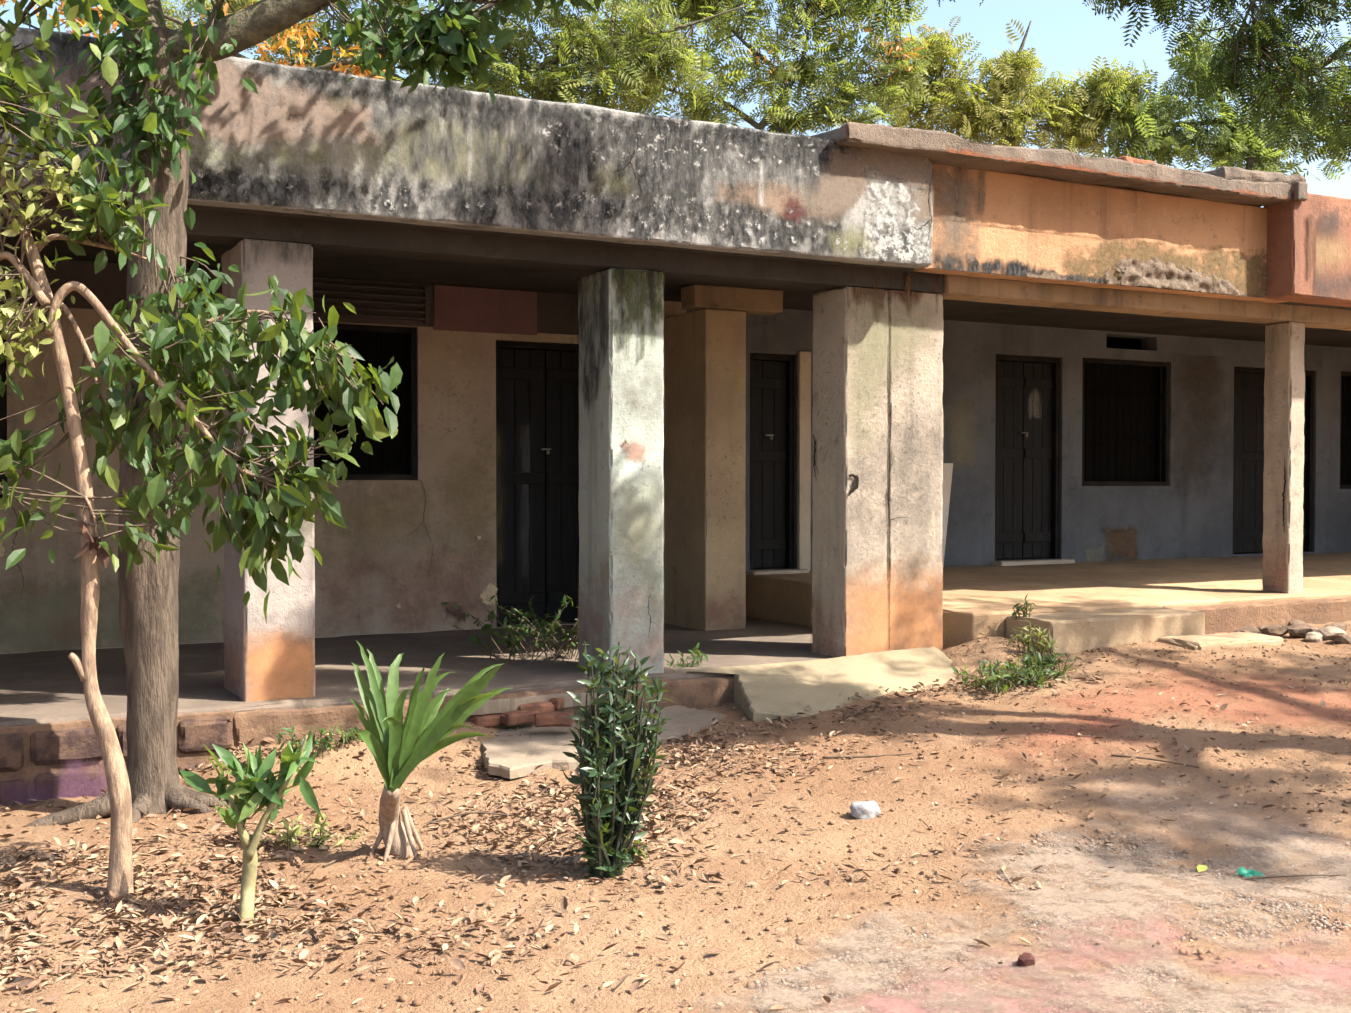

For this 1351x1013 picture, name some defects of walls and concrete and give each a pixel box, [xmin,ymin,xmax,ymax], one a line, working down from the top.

damp [0,156,75,185]
damp [97,160,130,188]
damp [188,64,1259,324]